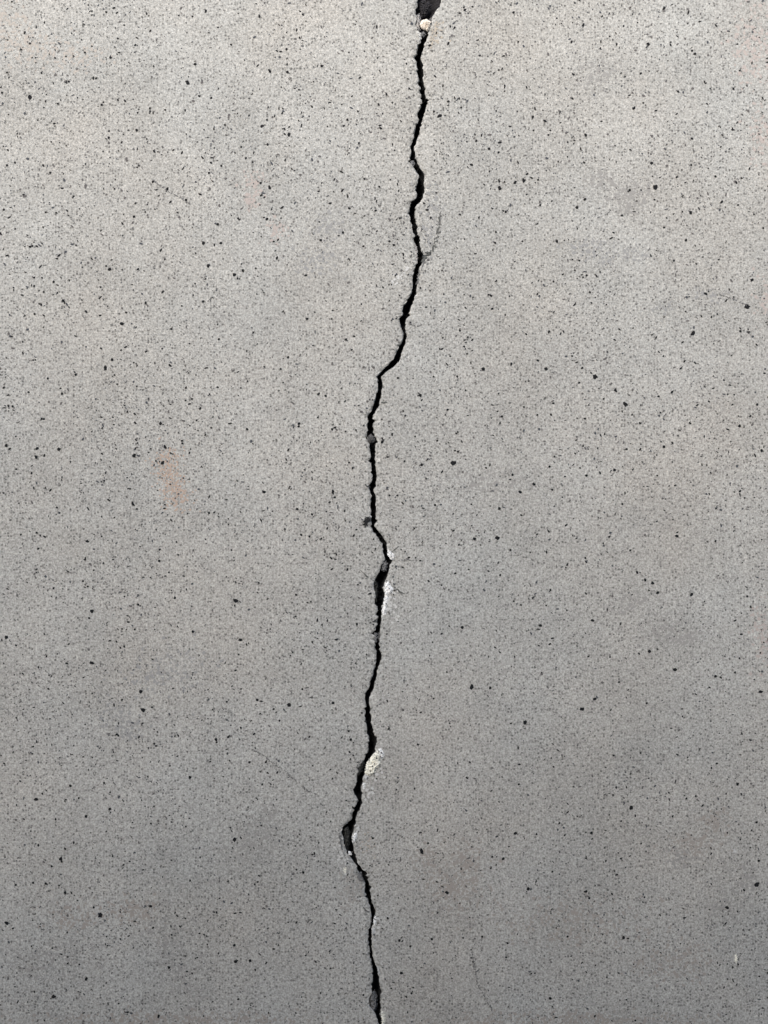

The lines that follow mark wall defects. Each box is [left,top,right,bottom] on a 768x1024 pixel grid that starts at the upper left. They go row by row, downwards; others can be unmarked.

crack [338,35,449,1024]